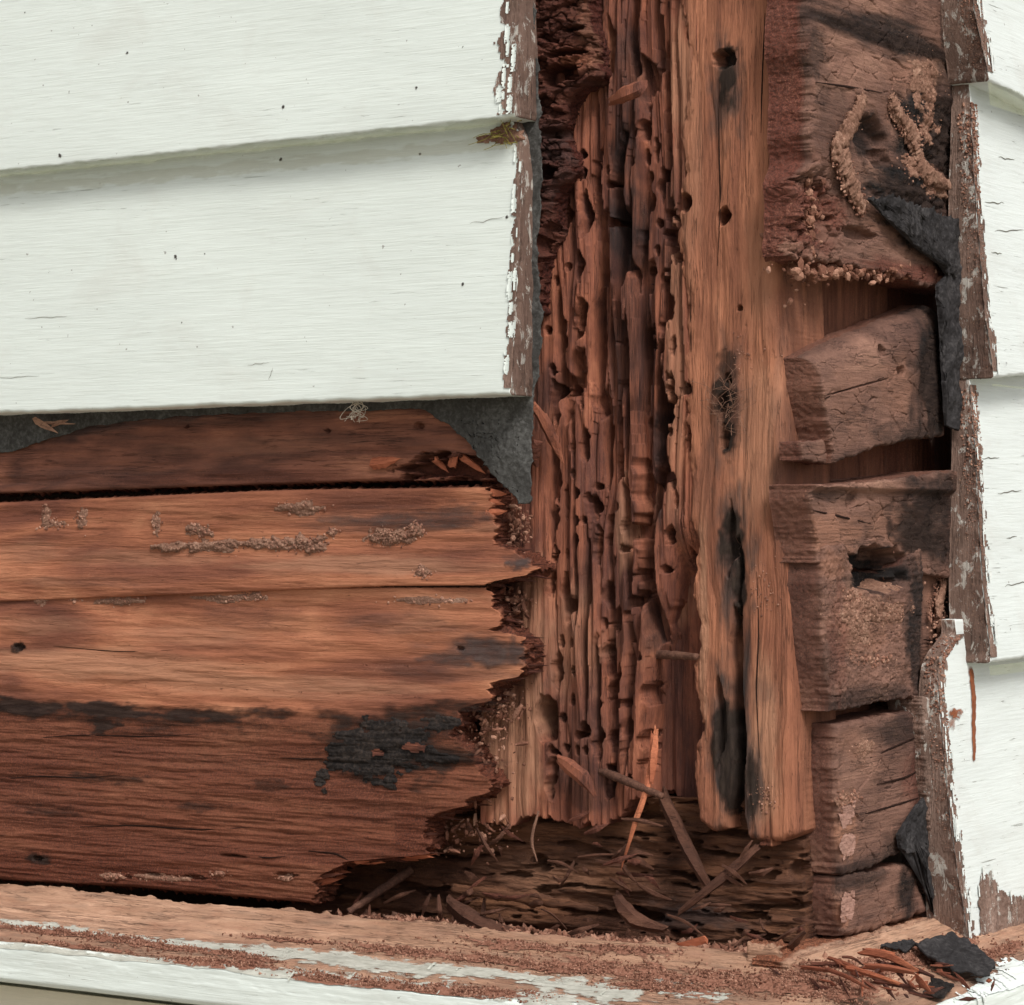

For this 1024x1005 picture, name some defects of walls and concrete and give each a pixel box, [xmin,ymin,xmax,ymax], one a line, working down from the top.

peeling [493,0,520,115]
peeling [503,140,523,388]
water stain [718,511,747,616]
water stain [0,695,292,735]
water stain [313,699,491,794]
water stain [710,694,759,818]
spalling [837,799,856,861]
corrosion [949,668,976,761]
peeling [923,633,1024,938]
spalling [840,890,855,923]
peeling [0,919,644,1005]
peeling [655,978,730,1003]